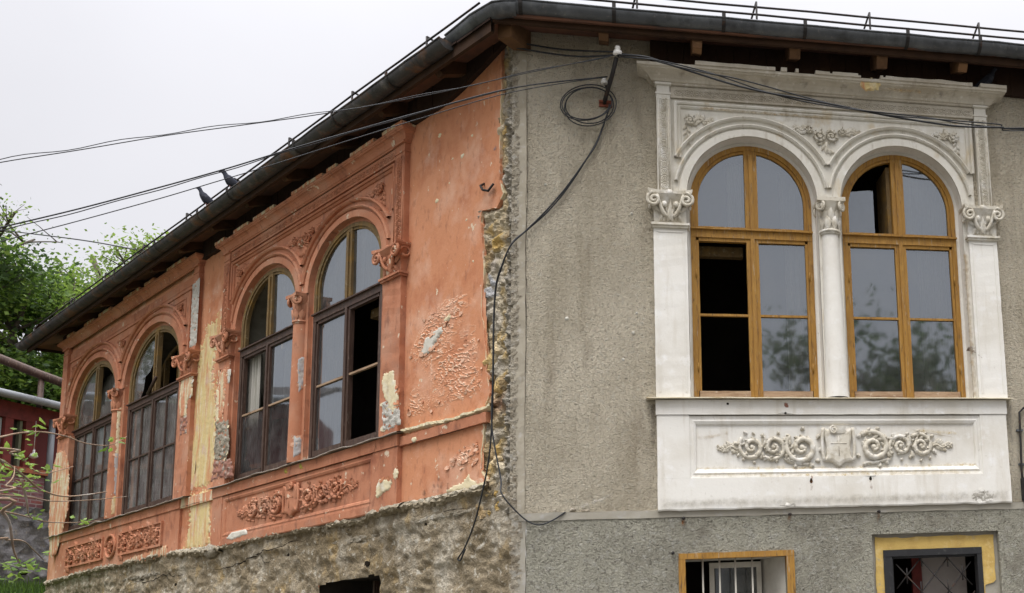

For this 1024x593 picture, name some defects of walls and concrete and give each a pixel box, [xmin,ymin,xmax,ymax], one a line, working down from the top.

spalling [42,46,523,593]